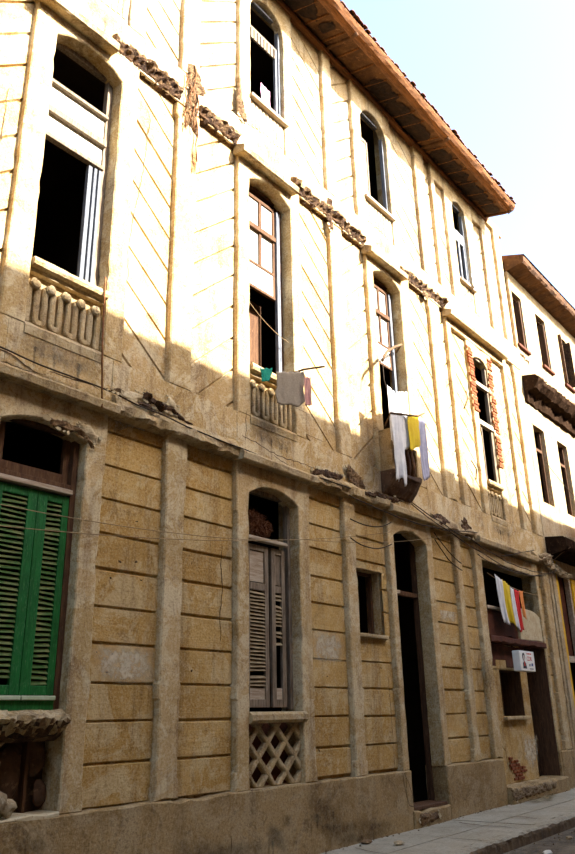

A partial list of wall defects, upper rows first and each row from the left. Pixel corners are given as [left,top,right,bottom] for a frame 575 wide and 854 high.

flaking render [179,63,207,162]
flaking render [237,83,247,124]
flaking render [106,387,194,426]
flaking render [42,414,104,451]
flaking render [311,464,403,504]
flaking render [461,517,475,540]
flaking render [508,756,557,803]